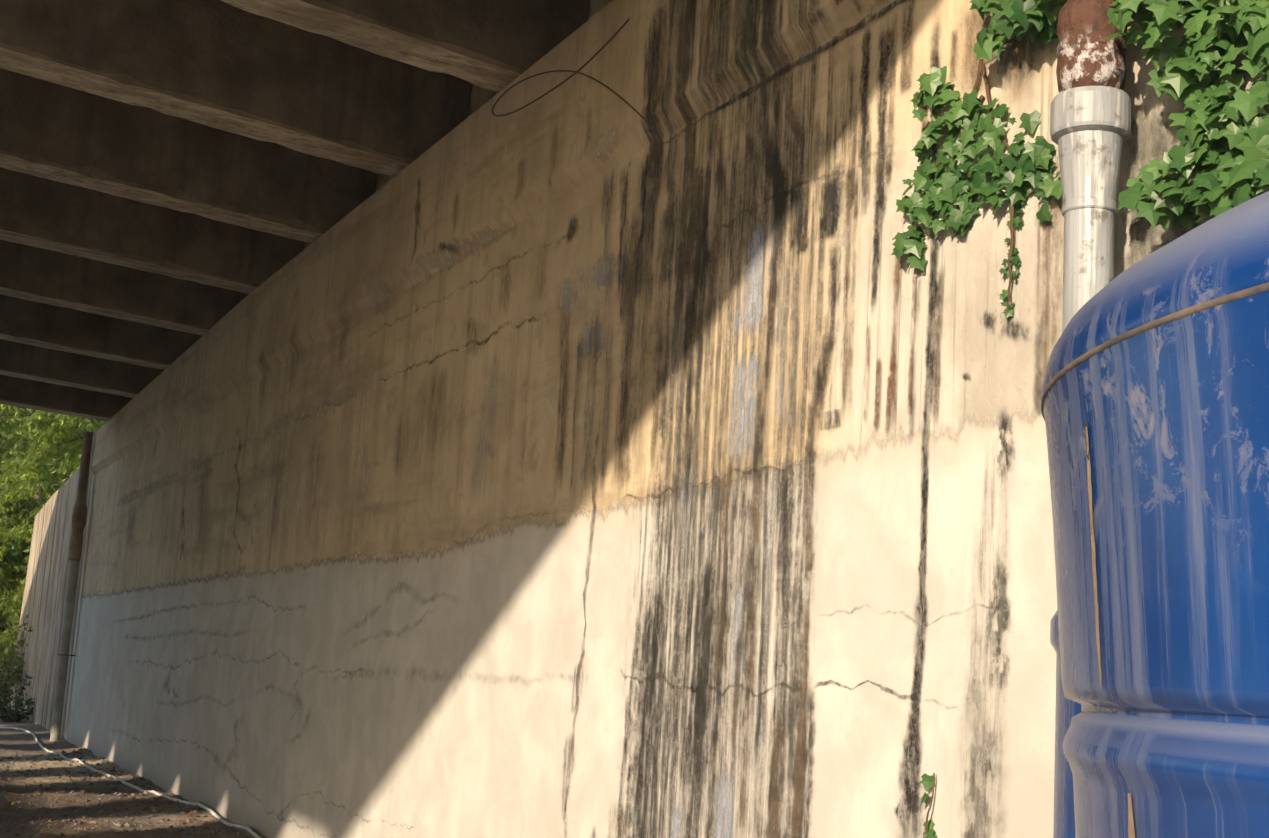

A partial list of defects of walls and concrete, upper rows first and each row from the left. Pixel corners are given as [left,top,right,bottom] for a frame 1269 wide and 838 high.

damp [931,33,939,68]
damp [992,32,1036,82]
damp [1130,110,1181,178]
damp [1130,201,1196,265]
damp [984,313,1023,337]
damp [558,0,896,838]
damp [998,415,1012,467]
damp [896,209,943,835]
crack [576,439,598,681]
damp [965,566,1008,838]